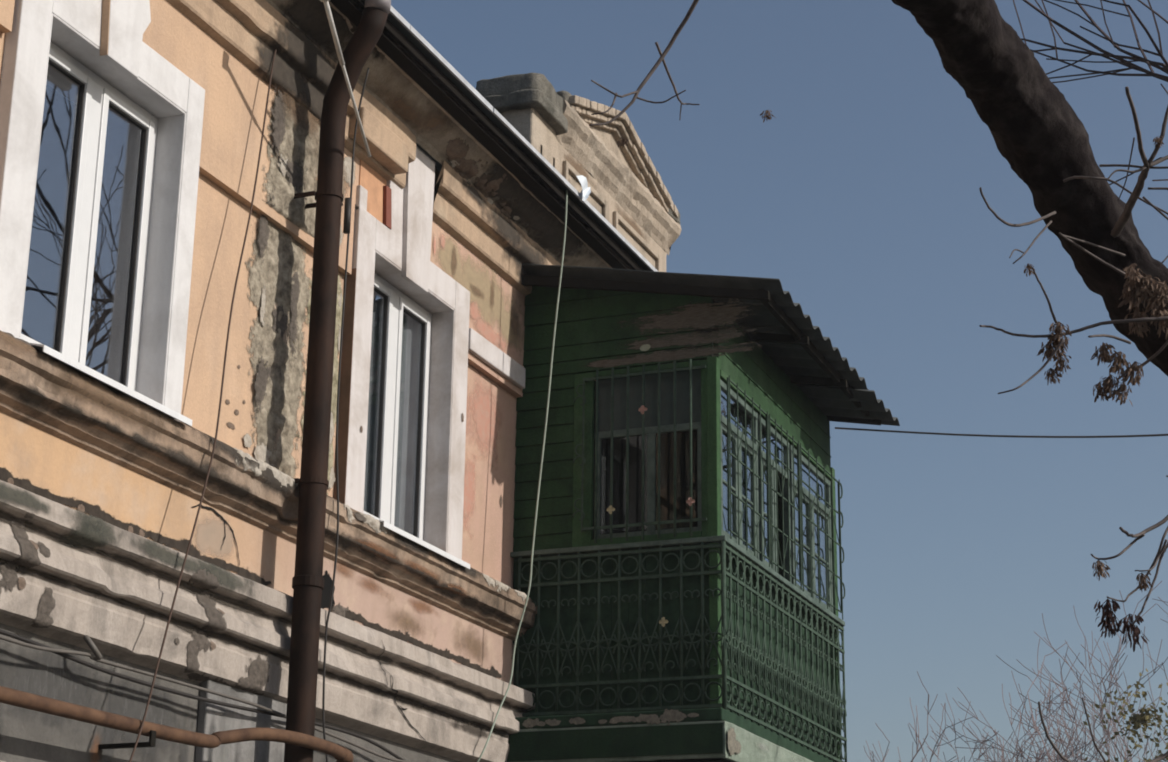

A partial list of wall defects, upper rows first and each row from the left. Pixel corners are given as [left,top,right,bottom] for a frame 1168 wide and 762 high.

flaking render [343,157,356,196]
leakage [562,158,589,182]
leakage [463,162,590,279]
spalling [226,88,320,488]
peeling [585,298,769,368]
flaking render [327,272,343,495]
flaking render [0,467,271,586]
flaking render [330,603,502,678]
spalling [522,709,699,728]